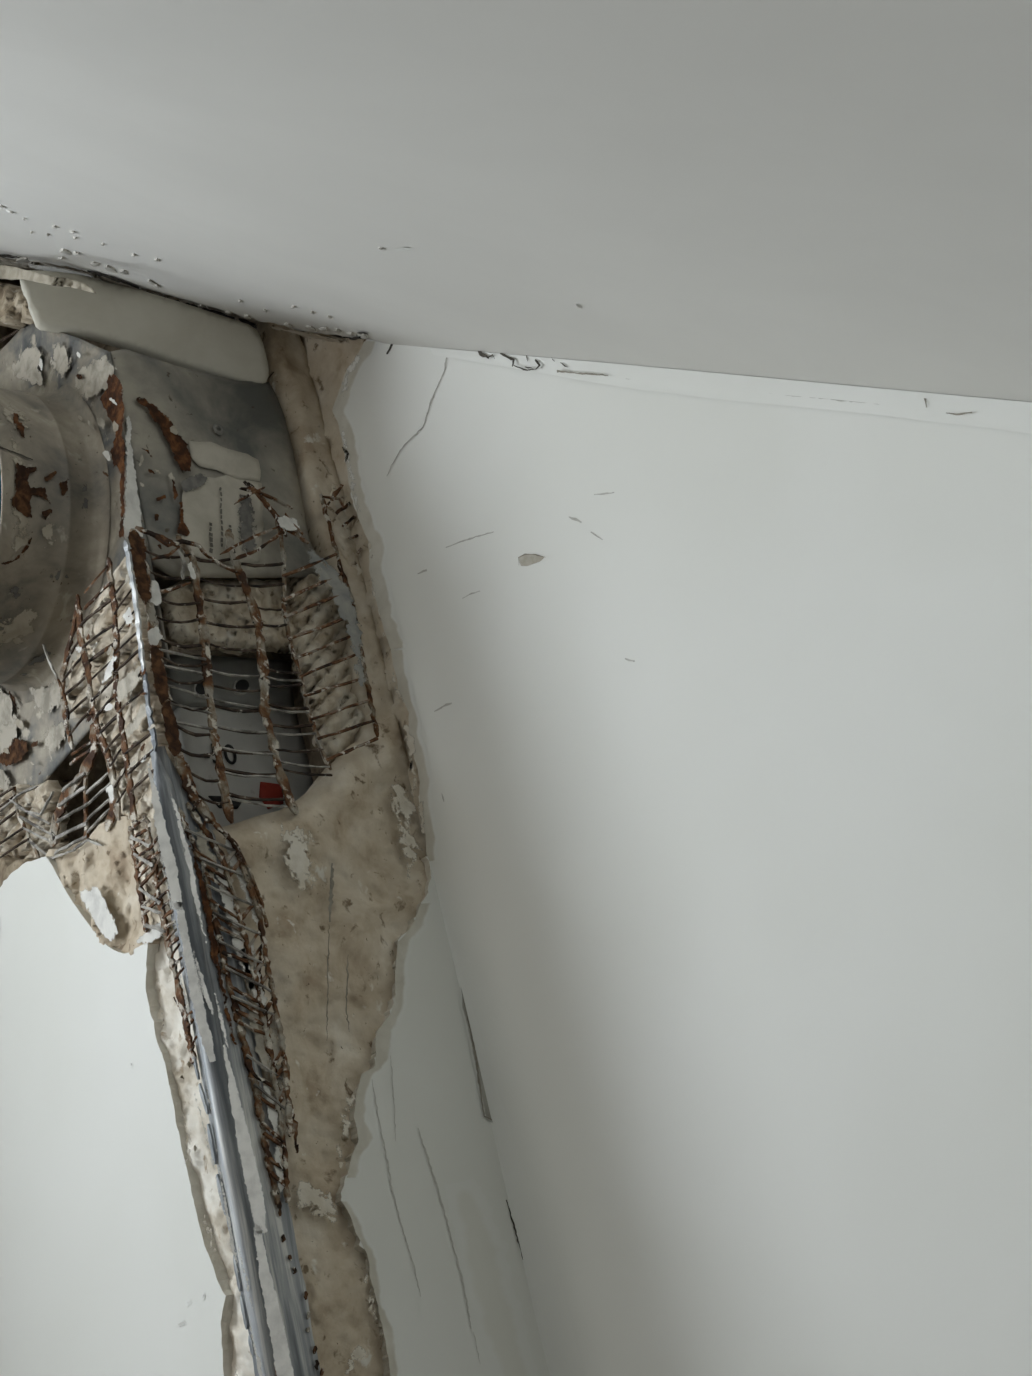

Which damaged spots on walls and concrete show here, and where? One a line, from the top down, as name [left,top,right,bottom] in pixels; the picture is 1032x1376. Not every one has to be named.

corrosion [13,411,25,438]
corrosion [2,463,69,565]
corrosion [100,374,192,605]
corrosion [0,738,40,767]
corrosion [80,634,110,690]
corrosion [139,646,182,757]
spalling [0,205,439,1376]
corrosion [189,845,237,1045]